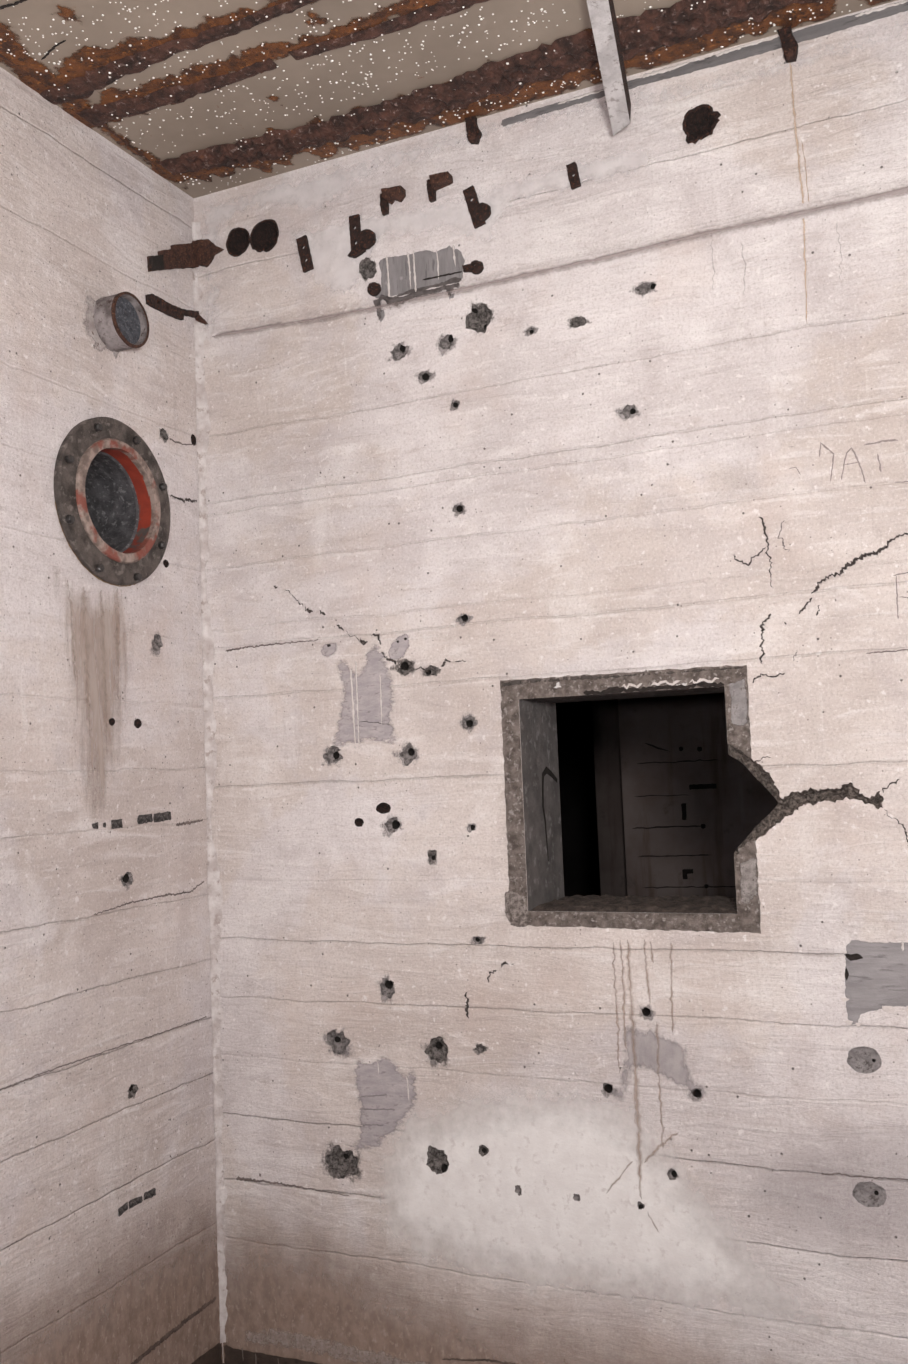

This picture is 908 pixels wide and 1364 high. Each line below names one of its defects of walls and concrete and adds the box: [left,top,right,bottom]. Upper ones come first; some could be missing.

corrosion [0,0,602,189]
corrosion [616,0,836,74]
crack [734,517,908,683]
damp [73,605,120,787]
peeling [321,634,441,766]
crack [882,779,908,842]
peeling [841,940,908,1026]
peeling [322,1029,417,1180]
crack [822,1172,908,1180]